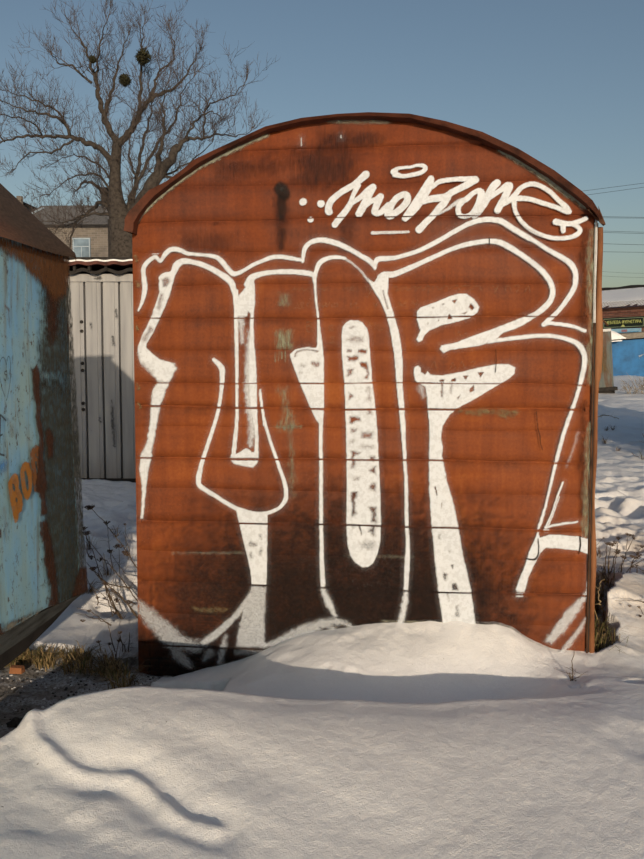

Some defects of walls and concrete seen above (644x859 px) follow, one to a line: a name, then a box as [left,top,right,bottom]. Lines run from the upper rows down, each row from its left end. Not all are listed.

rust [580,229,589,348]